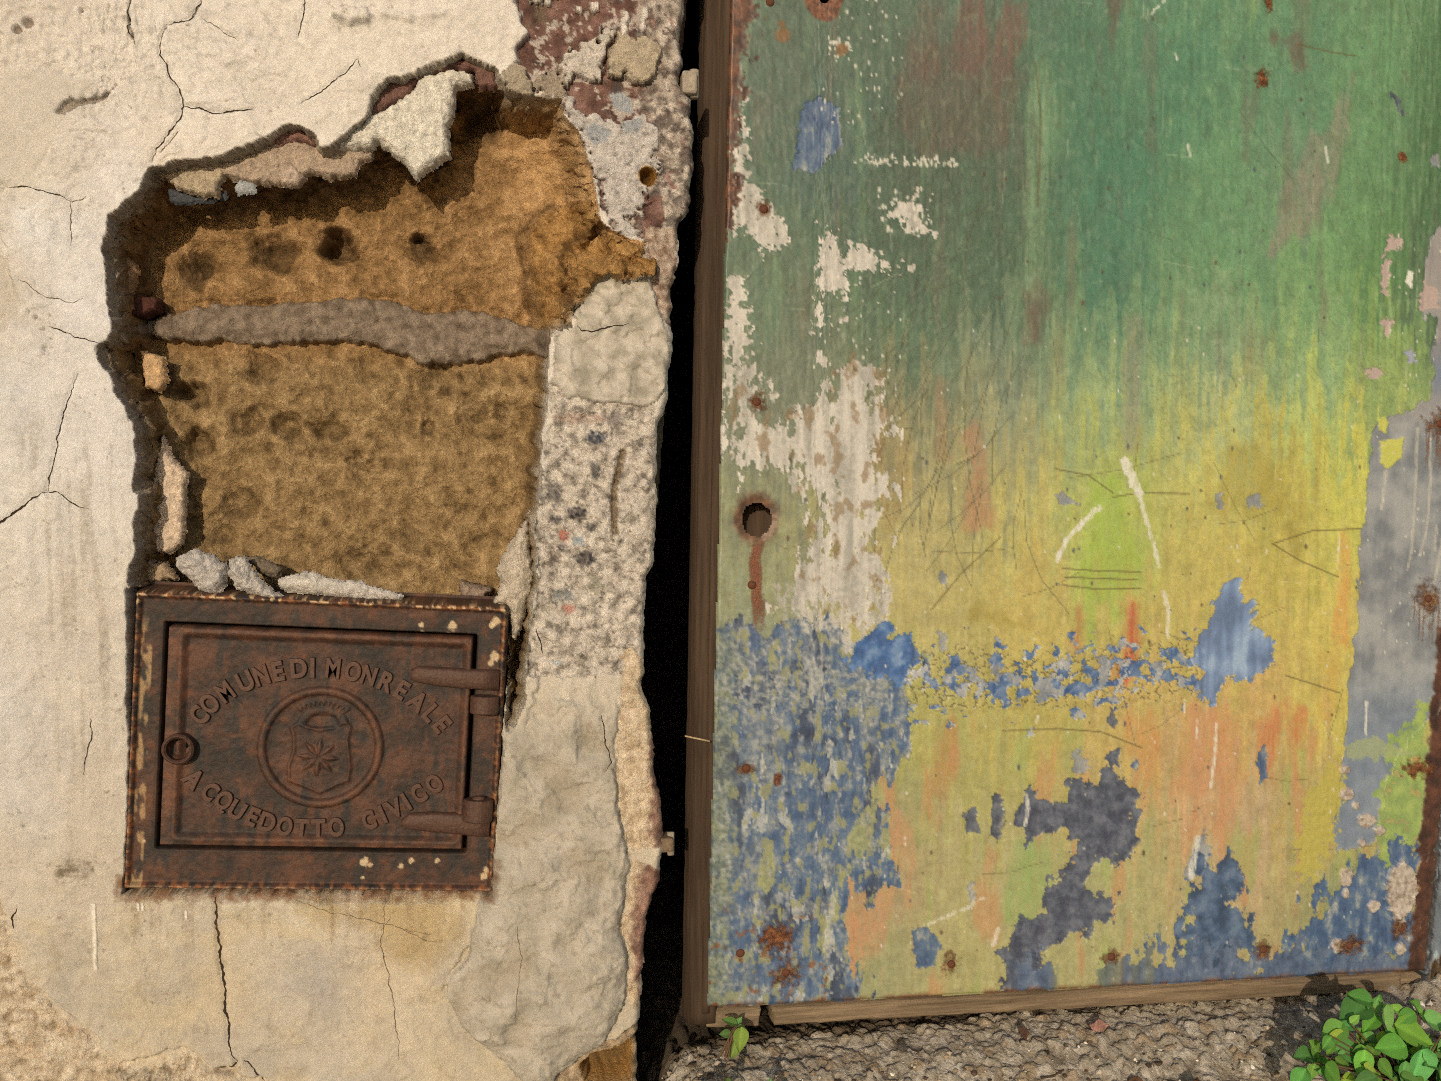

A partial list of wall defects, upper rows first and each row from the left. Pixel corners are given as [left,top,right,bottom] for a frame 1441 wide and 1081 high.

crack [126,2,252,160]
crack [8,185,86,240]
peeling [725,89,791,262]
crack [20,280,100,344]
crack [0,376,89,523]
spalling [96,0,694,1081]
corrosion [749,542,764,623]
peeling [707,221,1277,1007]
peeling [1101,225,1441,988]
corrosion [201,888,296,900]
flaking render [0,902,246,1081]
crack [214,888,265,1081]